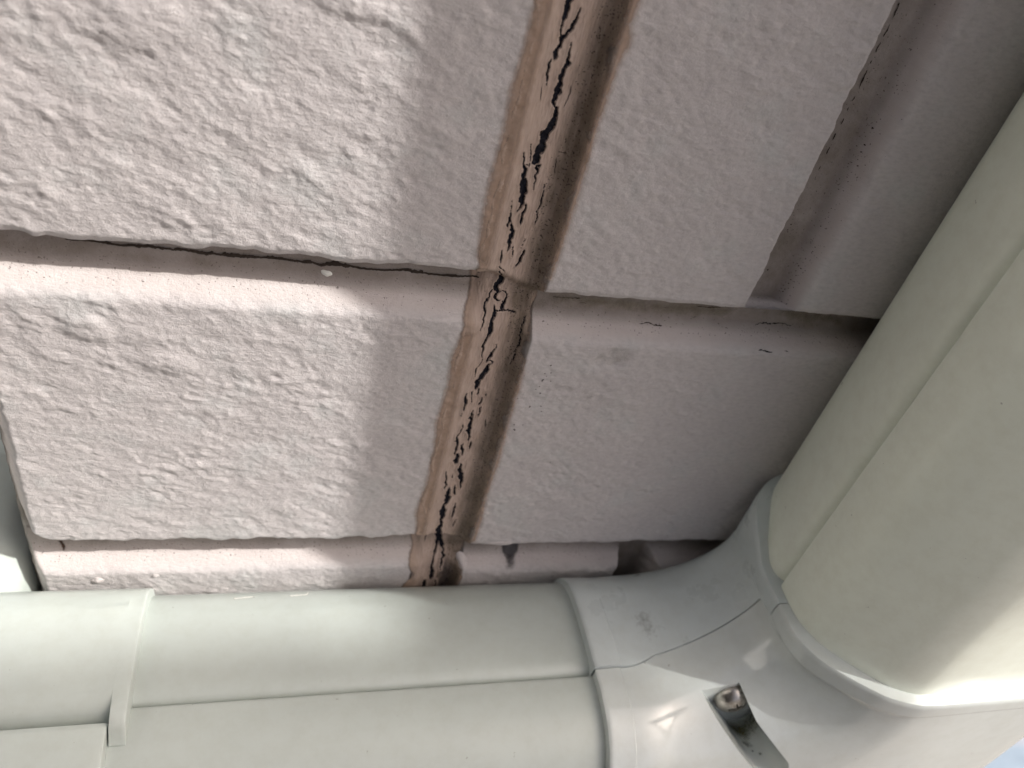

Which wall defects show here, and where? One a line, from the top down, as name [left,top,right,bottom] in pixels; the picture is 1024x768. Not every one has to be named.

crack [422,0,580,587]
damp [502,543,518,566]